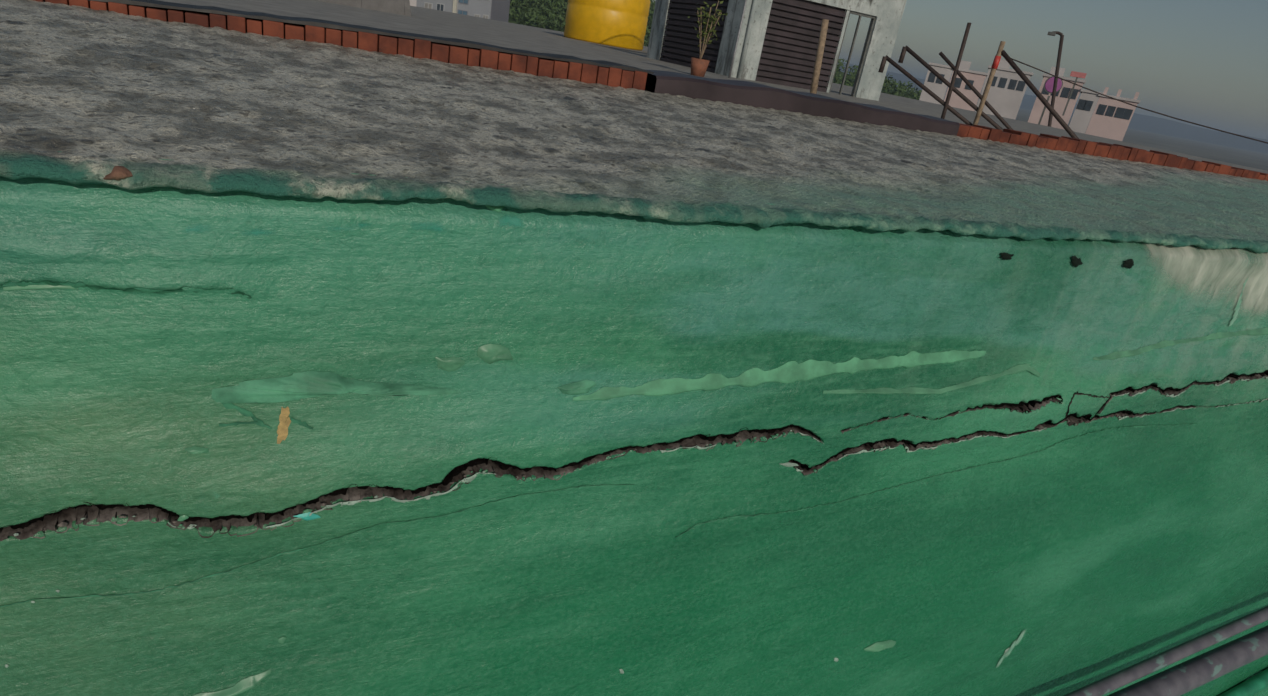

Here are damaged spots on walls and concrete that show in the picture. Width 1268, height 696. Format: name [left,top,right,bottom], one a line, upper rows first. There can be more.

crack [0,370,1268,607]